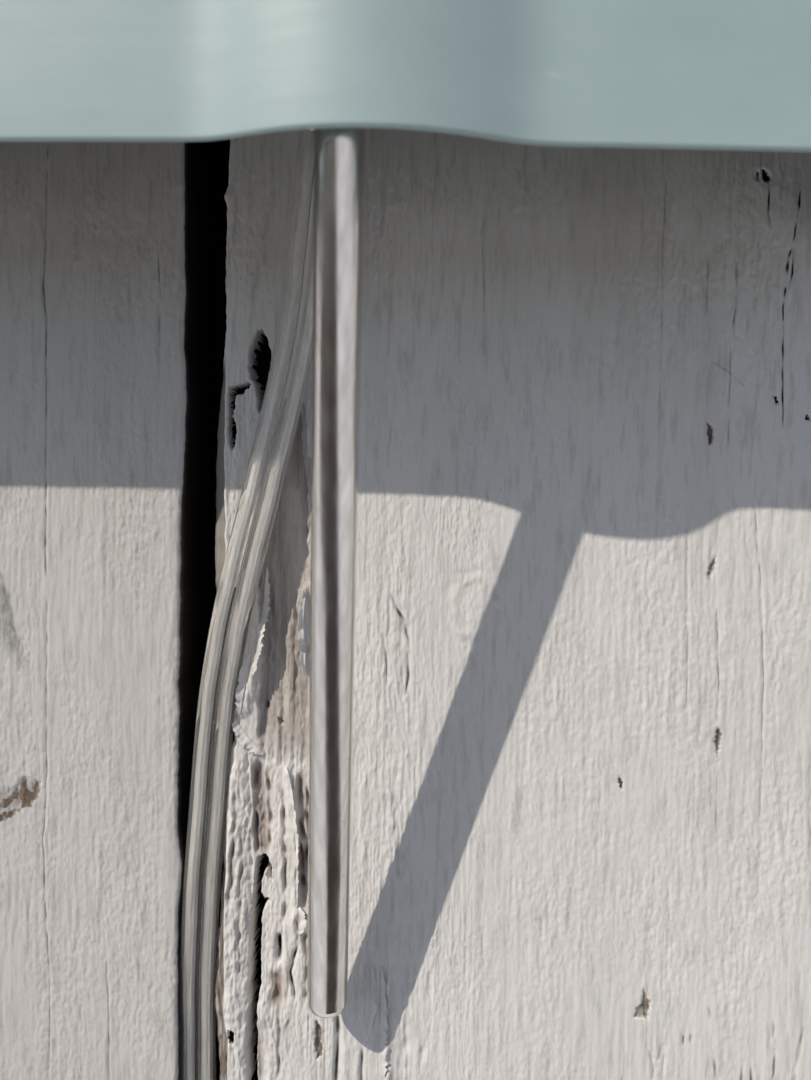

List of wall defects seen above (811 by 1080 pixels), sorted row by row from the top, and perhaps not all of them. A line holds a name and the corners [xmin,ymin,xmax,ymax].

crack [782,192,801,421]
peeling [232,412,312,756]
peeling [286,764,307,935]
peeling [315,1022,323,1058]